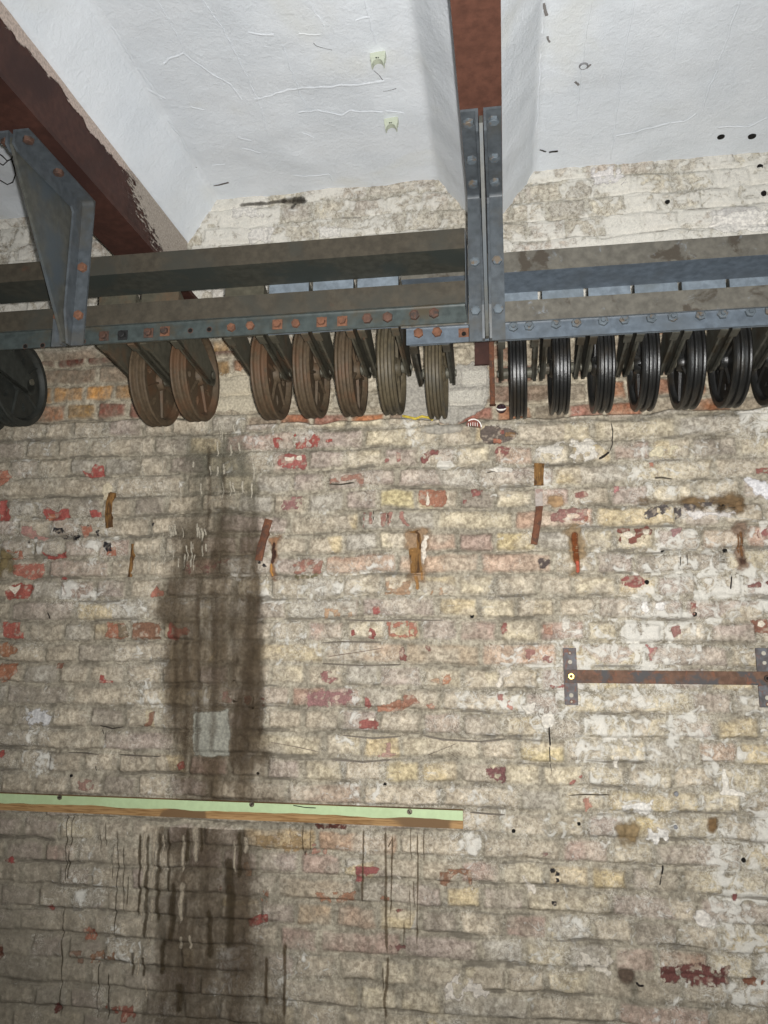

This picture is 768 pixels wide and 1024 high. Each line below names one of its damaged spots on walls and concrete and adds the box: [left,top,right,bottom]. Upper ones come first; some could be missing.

peeling [273,434,332,470]
damp [135,524,207,572]
peeling [550,491,588,523]
rust [564,524,586,575]
rust [680,493,749,570]
damp [100,827,206,973]
damp [226,834,248,959]
peeling [660,963,730,987]